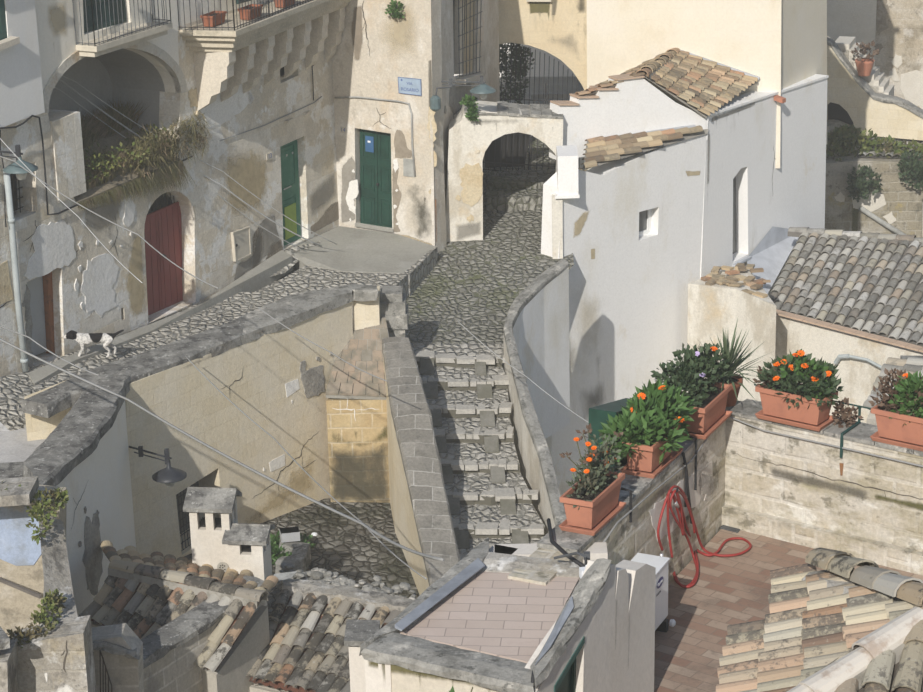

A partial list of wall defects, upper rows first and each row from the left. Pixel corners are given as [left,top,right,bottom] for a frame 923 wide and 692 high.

flaking render [188,84,263,129]
flaking render [122,197,135,237]
flaking render [22,220,123,370]
crack [254,434,316,497]
crack [734,453,921,501]